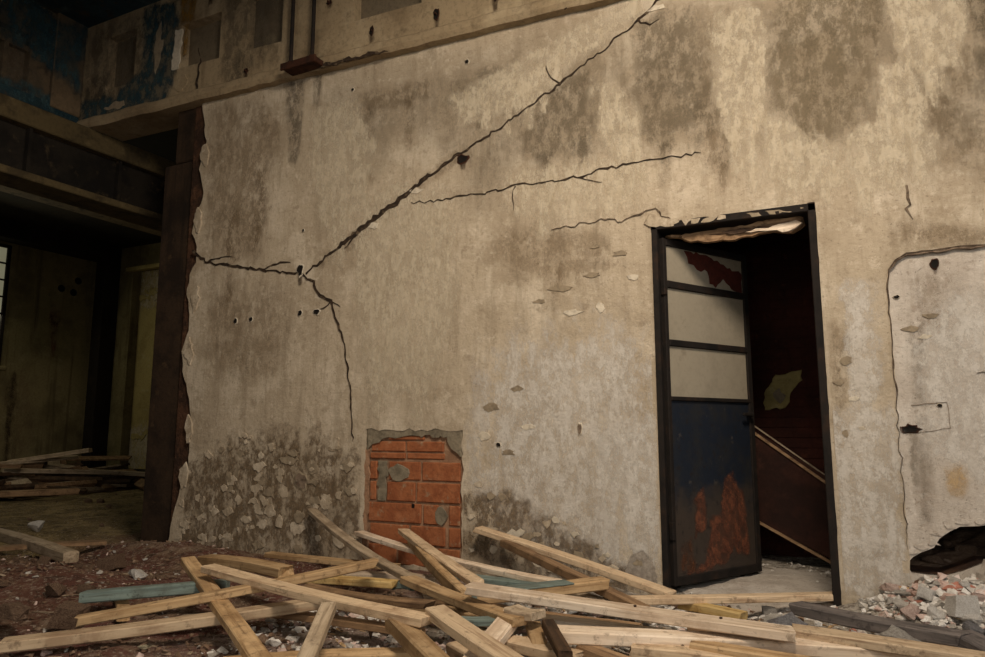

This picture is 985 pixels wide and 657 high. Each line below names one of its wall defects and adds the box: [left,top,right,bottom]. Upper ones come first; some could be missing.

peeling [81,3,189,119]
spalling [187,170,203,250]
spalling [193,108,210,167]
crack [192,0,701,439]
damp [450,0,642,136]
damp [507,83,647,238]
peeling [684,251,742,293]
damp [708,0,967,216]
peeling [763,370,802,410]
peeling [170,408,361,557]
corrosion [688,475,750,574]
spalling [909,518,985,554]